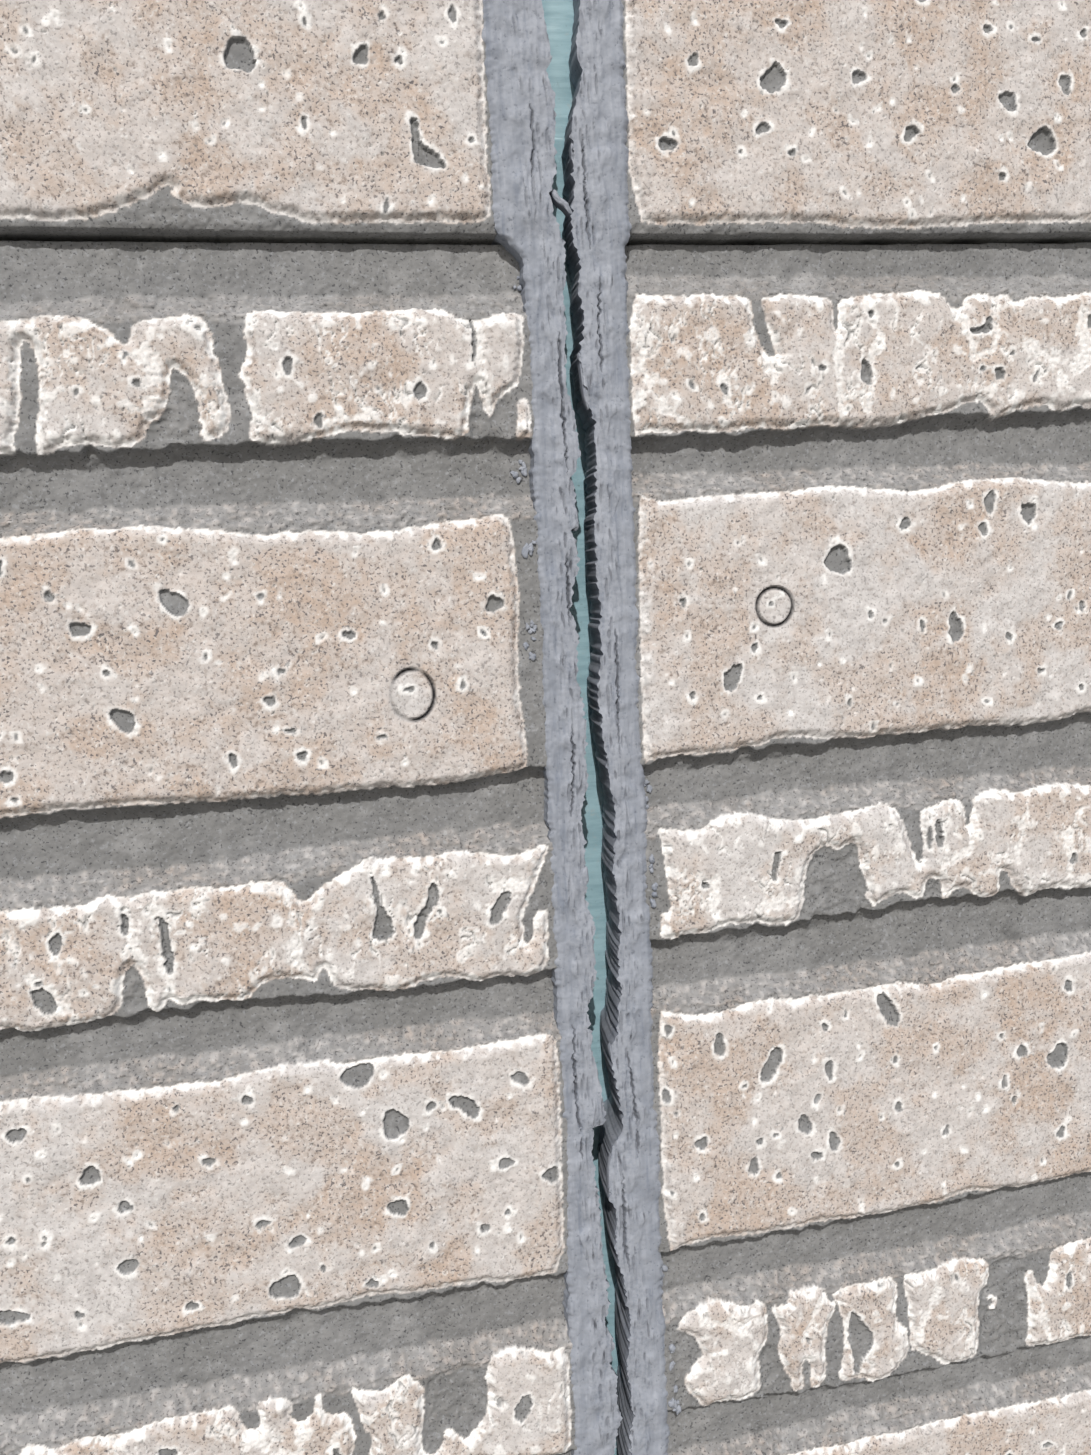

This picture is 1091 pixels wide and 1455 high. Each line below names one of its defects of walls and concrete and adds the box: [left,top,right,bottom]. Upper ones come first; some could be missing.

crack [529,0,641,1455]